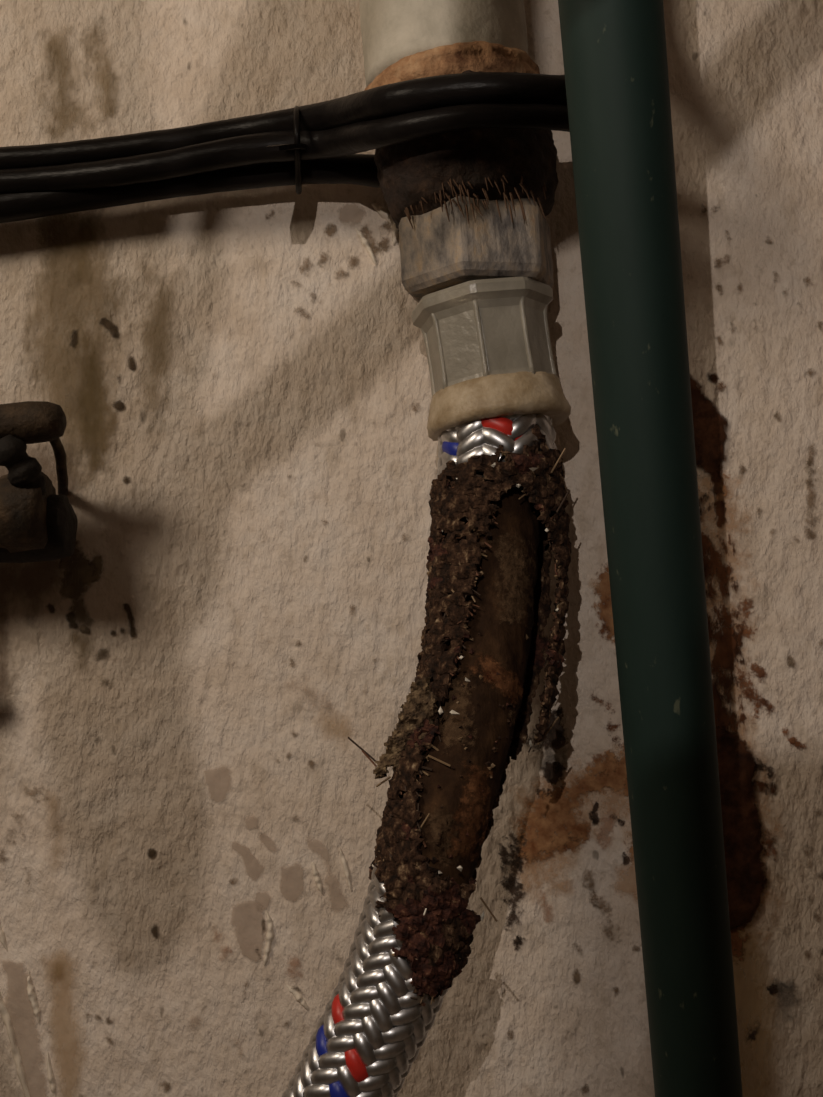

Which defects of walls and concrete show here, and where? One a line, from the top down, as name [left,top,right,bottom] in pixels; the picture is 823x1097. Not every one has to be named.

water stain [36,214,124,469]
water stain [145,294,167,370]
rust [594,567,615,643]
rust [690,373,779,935]
rust [782,729,806,749]
peeling [205,767,230,802]
rust [517,696,638,921]
peeling [232,841,263,880]
peeling [280,840,352,909]
peeling [224,893,274,966]